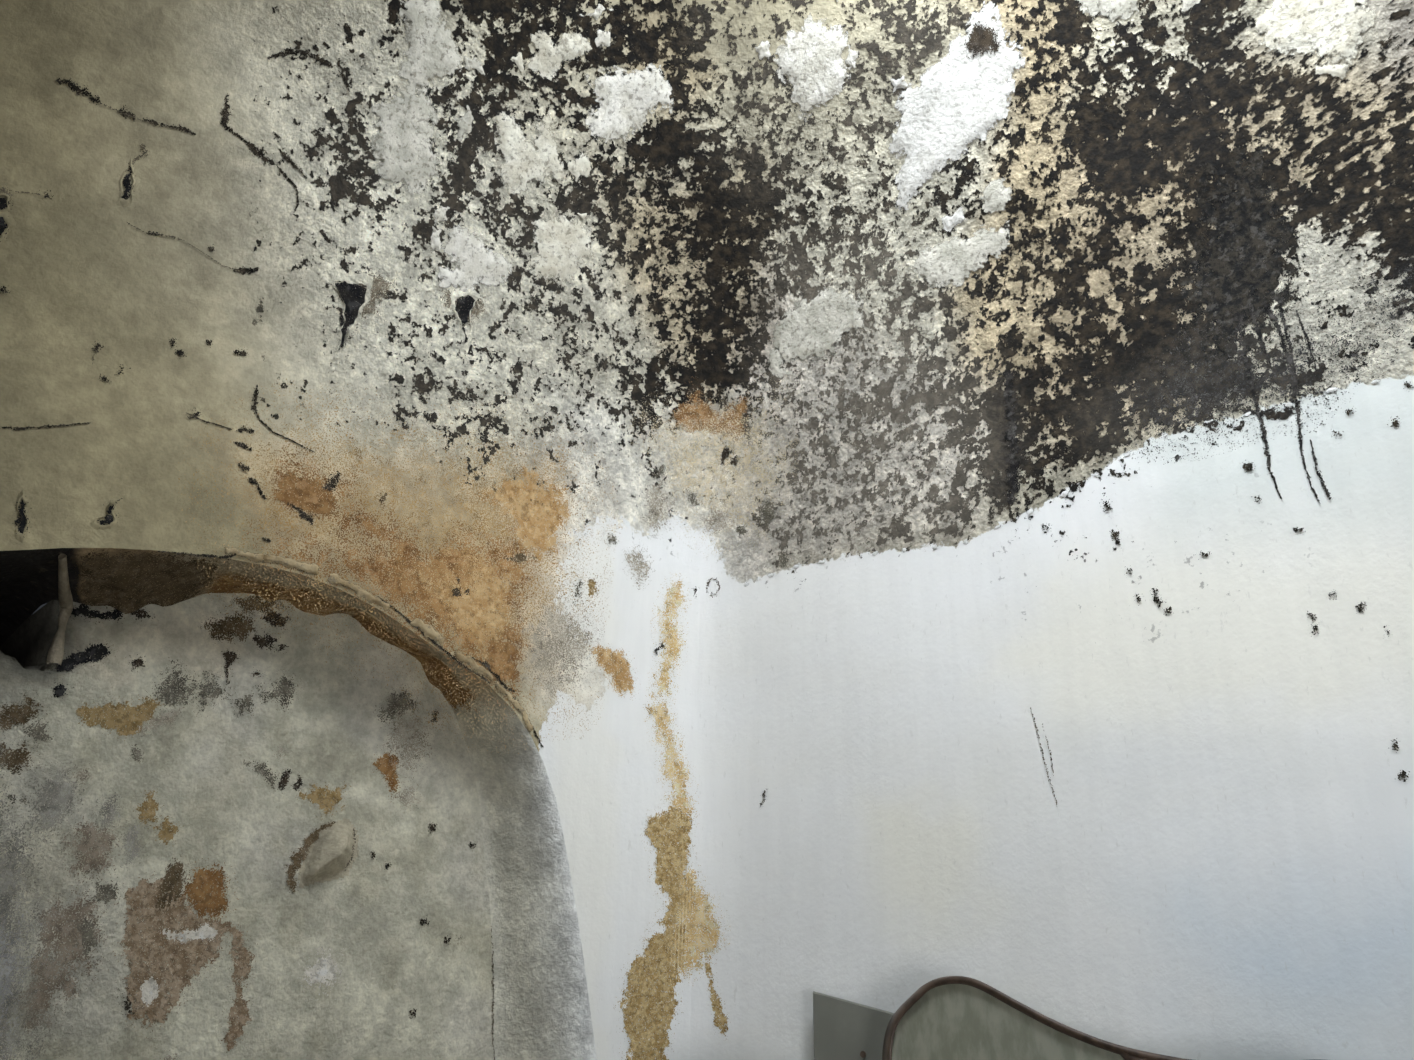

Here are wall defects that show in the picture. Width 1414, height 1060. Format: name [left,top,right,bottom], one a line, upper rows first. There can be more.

crack [267,47,350,92]
crack [56,77,307,213]
damp [68,0,1414,754]
peeling [719,444,741,470]
peeling [606,465,780,590]
peeling [768,550,799,577]
spalling [70,604,159,625]
spalling [51,643,146,702]
spalling [158,547,638,747]
spalling [76,694,190,741]